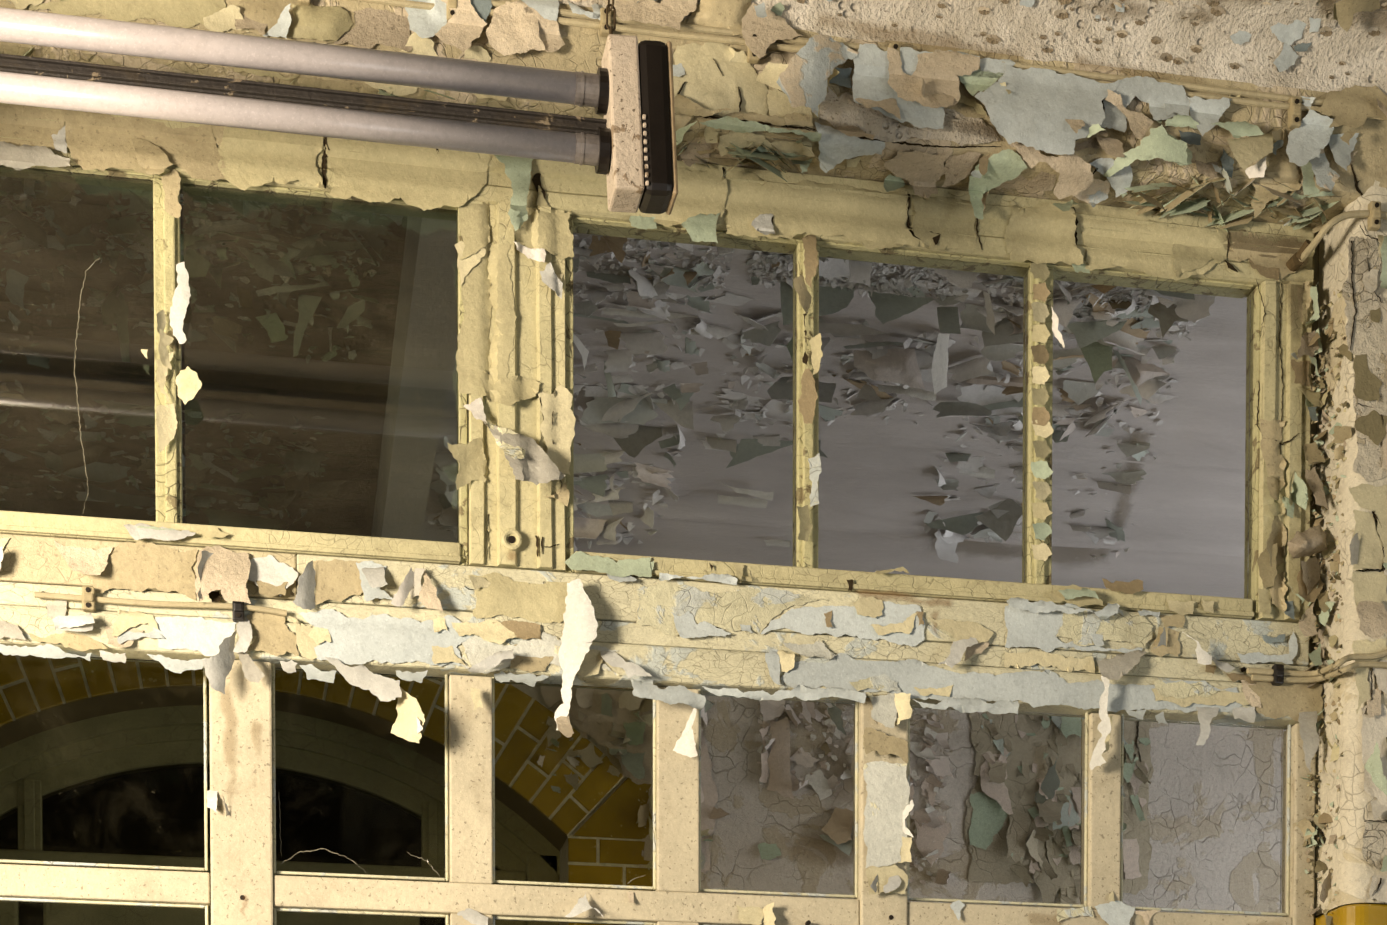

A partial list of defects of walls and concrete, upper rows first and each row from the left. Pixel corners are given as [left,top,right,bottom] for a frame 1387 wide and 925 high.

spalling [1040,0,1076,53]
spalling [1091,0,1203,65]
spalling [1151,0,1226,26]
spalling [1229,0,1387,72]
crack [321,137,330,188]
crack [906,194,921,240]
crack [1071,207,1079,248]
crack [1350,164,1382,351]
peeling [0,34,1387,564]
peeling [1237,235,1387,903]
peeling [0,408,729,874]
peeling [457,908,488,925]